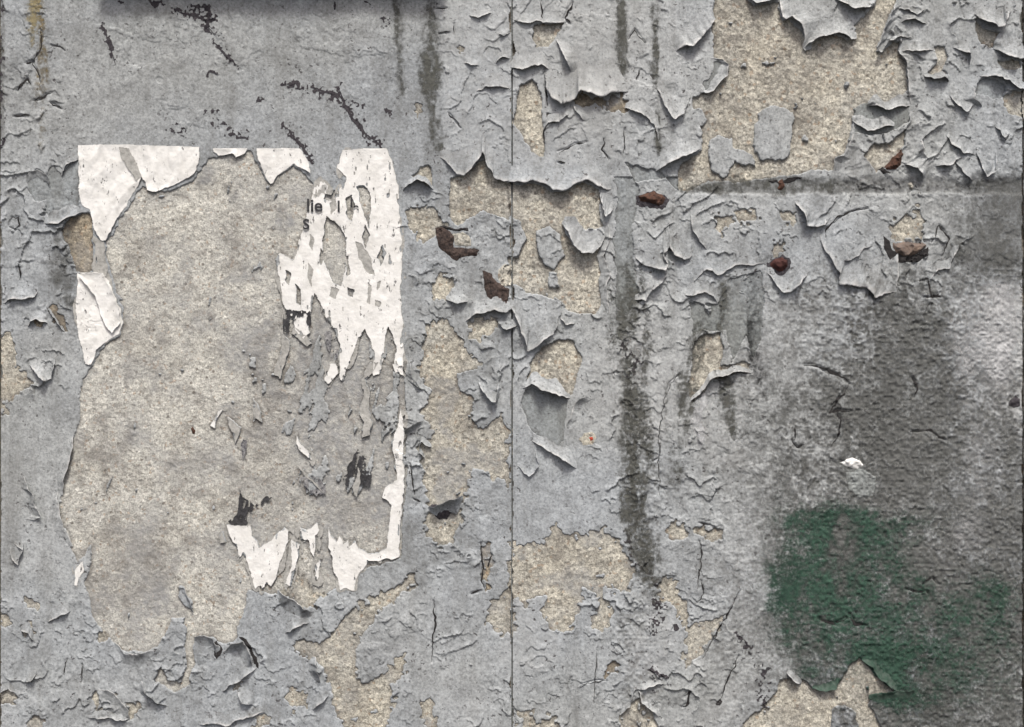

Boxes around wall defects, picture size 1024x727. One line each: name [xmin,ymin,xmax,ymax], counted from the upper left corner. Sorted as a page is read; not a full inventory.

peeling [949,0,1024,121]
peeling [26,153,93,273]
peeling [935,131,997,181]
peeling [3,283,68,332]
peeling [400,0,959,549]
peeling [1,332,56,416]
peeling [49,151,422,727]
water stain [612,263,661,602]
water stain [766,176,1024,727]
peeling [1,596,70,641]
peeling [480,522,723,727]
peeling [734,631,917,727]